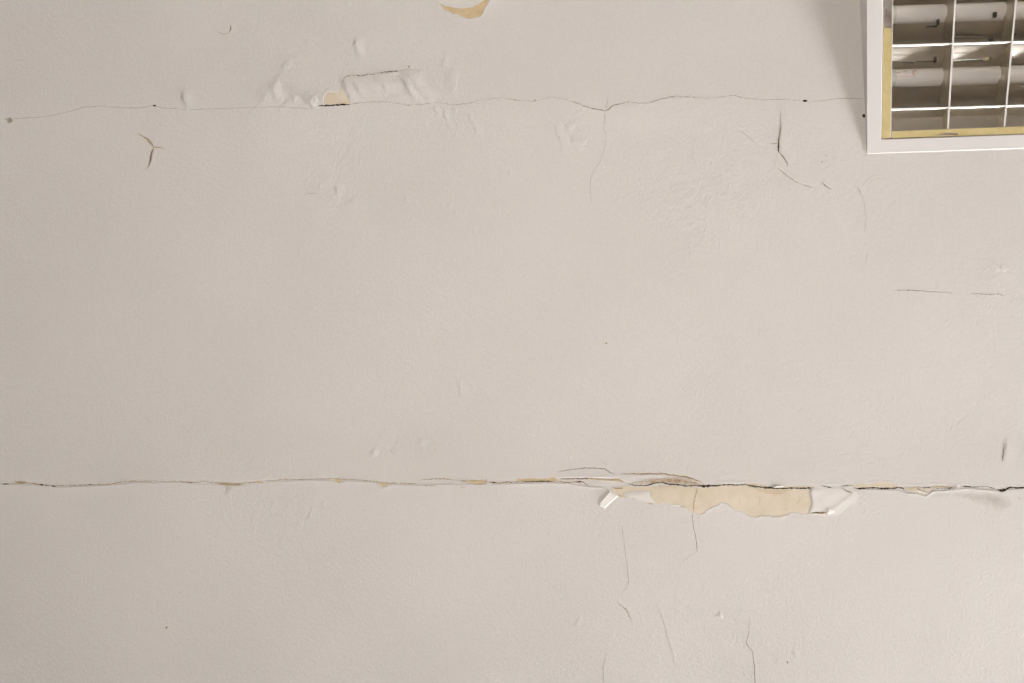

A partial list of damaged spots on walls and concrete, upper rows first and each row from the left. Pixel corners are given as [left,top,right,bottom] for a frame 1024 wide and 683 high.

peeling [436,0,494,22]
crack [13,95,861,196]
crack [0,467,1024,501]
peeling [599,479,901,522]